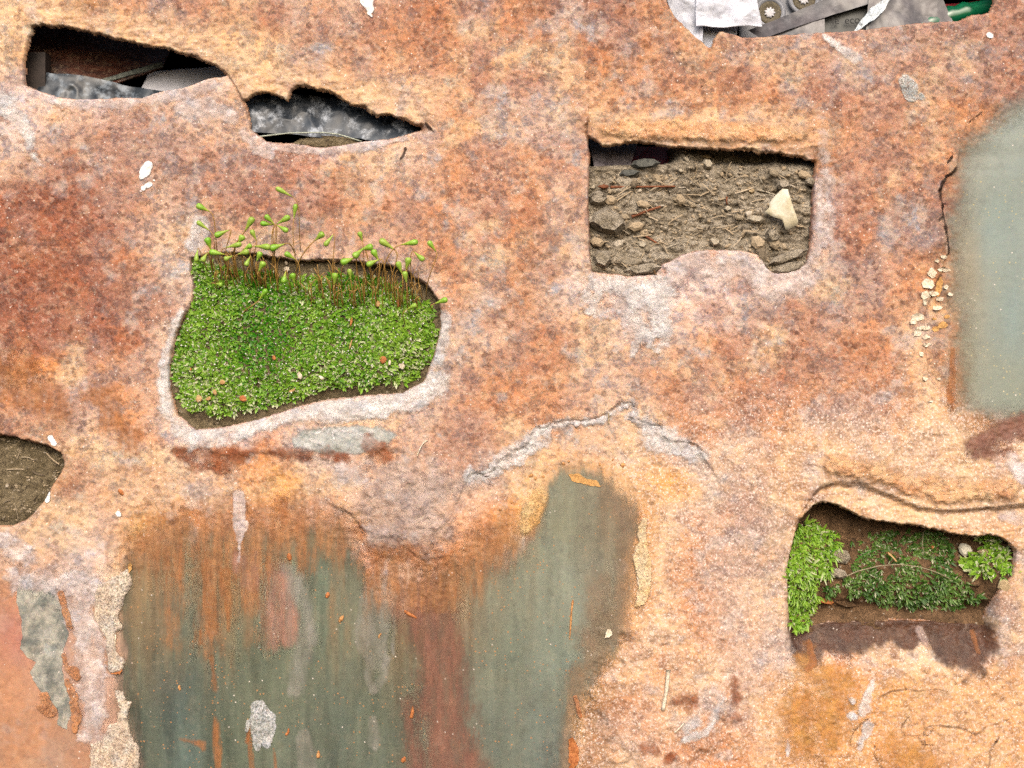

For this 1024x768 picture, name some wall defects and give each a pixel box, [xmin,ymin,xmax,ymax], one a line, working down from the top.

crack [938,155,957,254]
rust [623,263,662,275]
rust [173,447,349,474]
water stain [335,461,369,485]
rust [367,434,392,461]
rust [965,413,1024,459]
water stain [233,490,248,558]
rust [135,498,345,645]
rust [367,525,516,619]
peeling [959,543,972,556]
peeling [997,579,1011,591]
water stain [245,700,276,751]